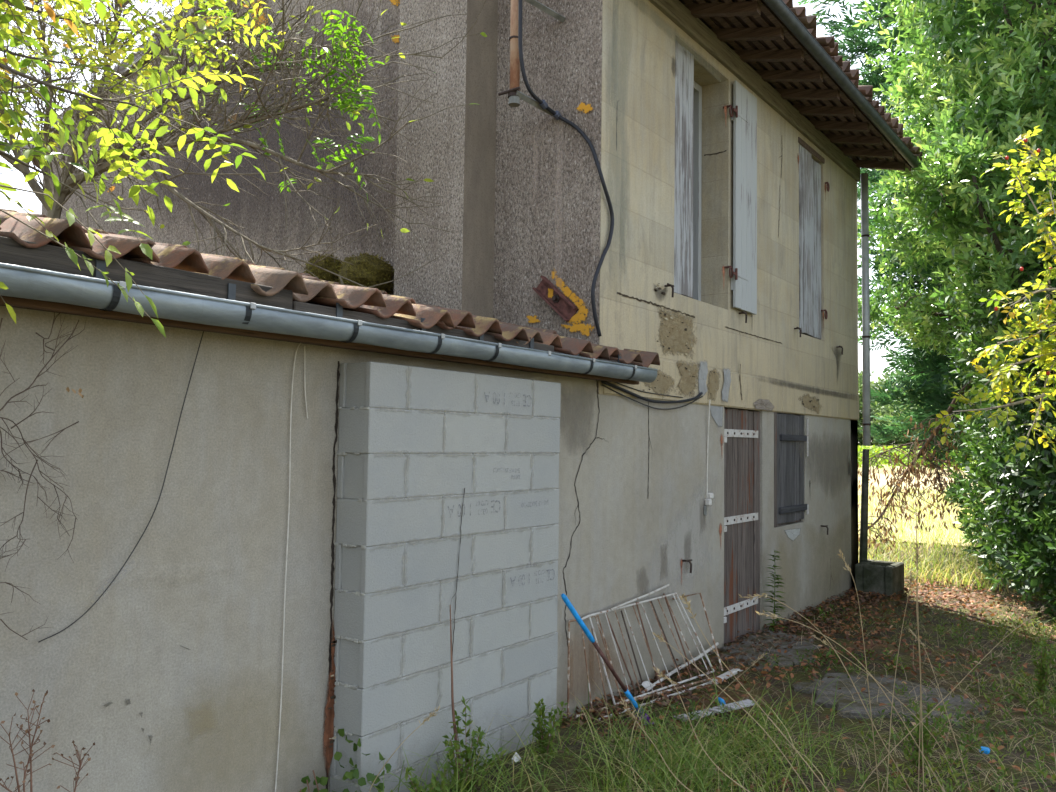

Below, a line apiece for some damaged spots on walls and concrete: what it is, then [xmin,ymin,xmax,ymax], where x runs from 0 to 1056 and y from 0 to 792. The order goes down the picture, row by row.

spalling [643,283,720,400]
spalling [800,394,820,414]
crack [563,380,605,646]